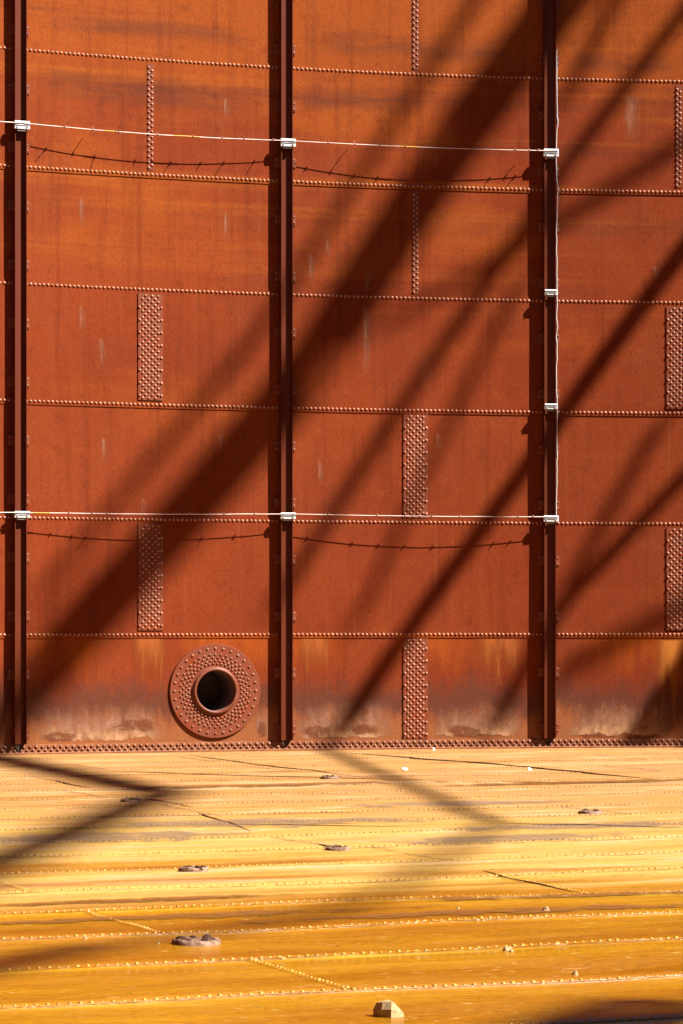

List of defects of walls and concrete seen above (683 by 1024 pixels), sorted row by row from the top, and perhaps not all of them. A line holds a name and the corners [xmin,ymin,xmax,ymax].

rust [137,639,162,662]
rust [483,639,517,671]
rust [660,640,679,690]
damp [44,714,153,741]
damp [302,708,383,739]
damp [440,713,514,737]
damp [574,709,663,739]